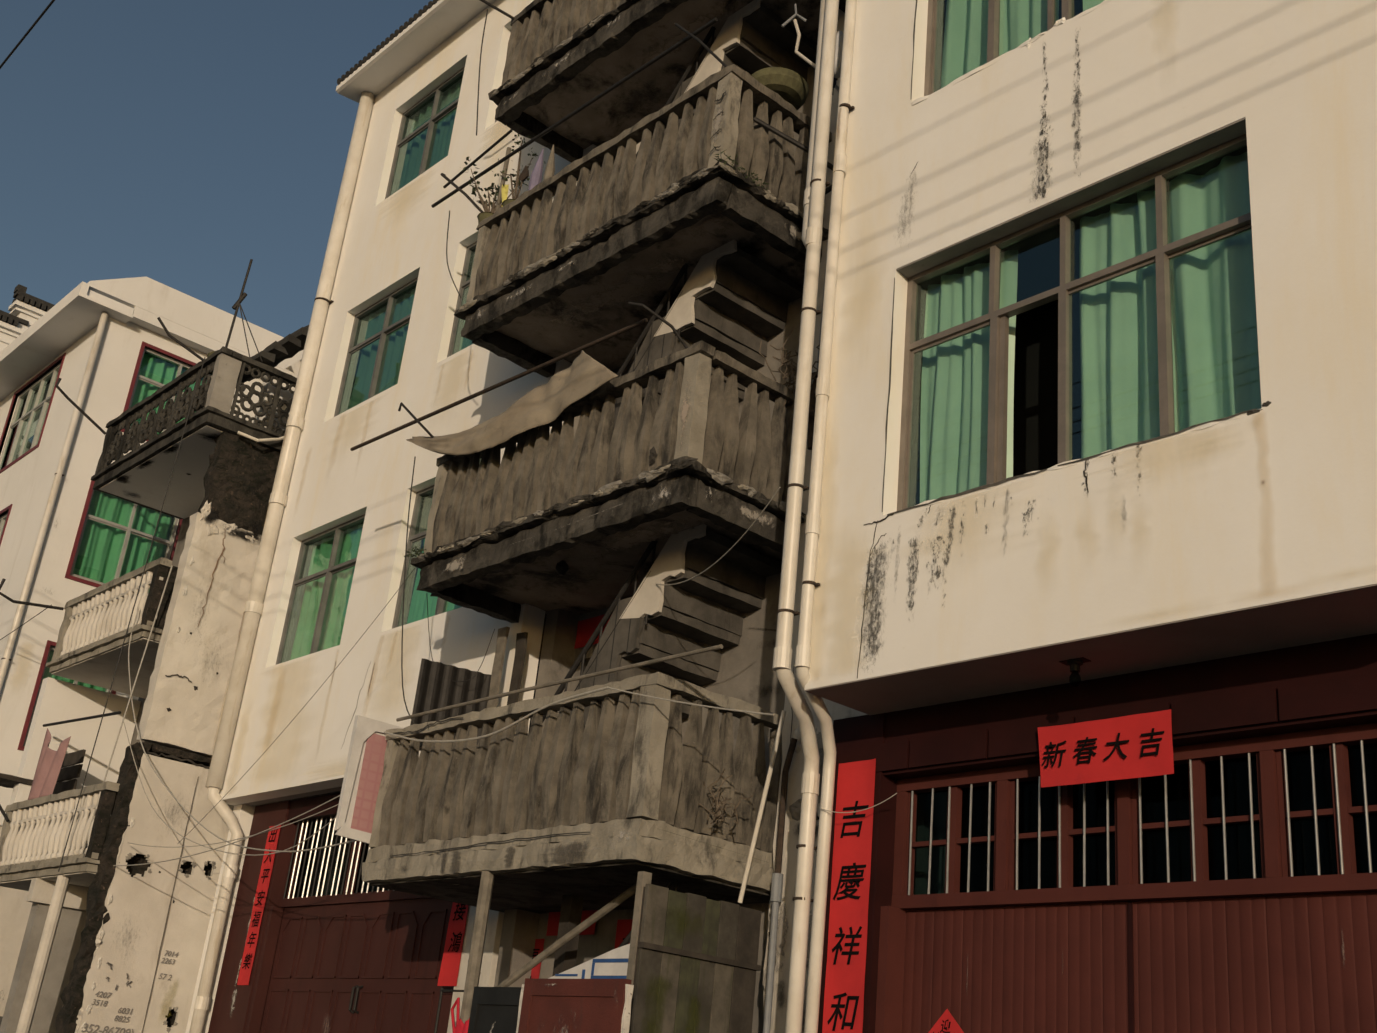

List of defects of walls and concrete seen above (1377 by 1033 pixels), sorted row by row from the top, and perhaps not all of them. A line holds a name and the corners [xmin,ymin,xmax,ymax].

damp [1033,46,1051,198]
damp [1072,39,1081,176]
crack [198,527,226,626]
damp [863,508,964,656]
spalling [125,853,161,877]
spalling [179,860,216,880]
spalling [163,1007,178,1033]